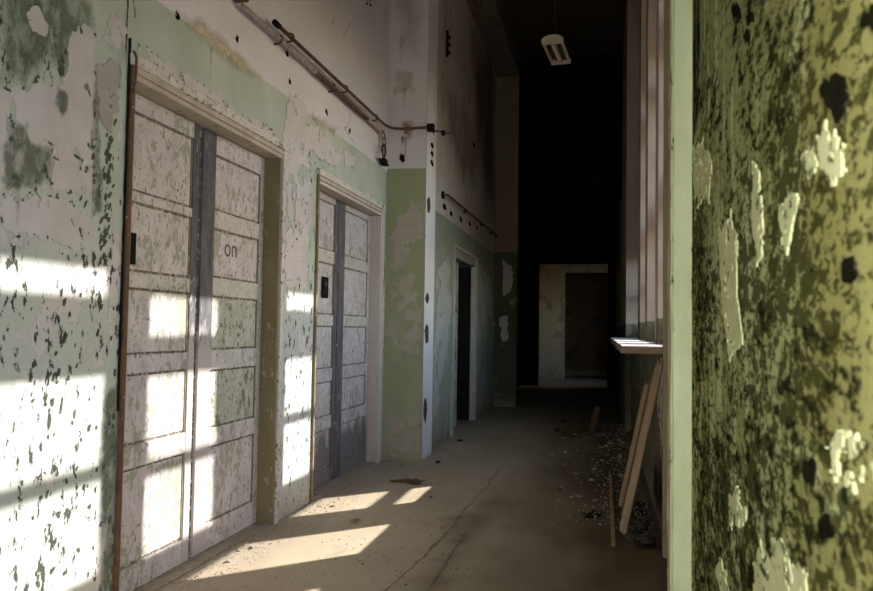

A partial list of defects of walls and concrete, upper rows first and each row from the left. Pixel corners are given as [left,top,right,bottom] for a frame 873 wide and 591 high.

peeling [0,13,129,276]
peeling [282,77,356,294]
peeling [692,136,712,209]
peeling [718,205,743,362]
peeling [750,161,765,267]
peeling [777,188,800,258]
peeling [801,72,850,187]
spalling [841,256,860,284]
crack [383,468,500,591]
peeling [728,485,747,530]
peeling [753,537,808,591]
peeling [825,429,873,495]